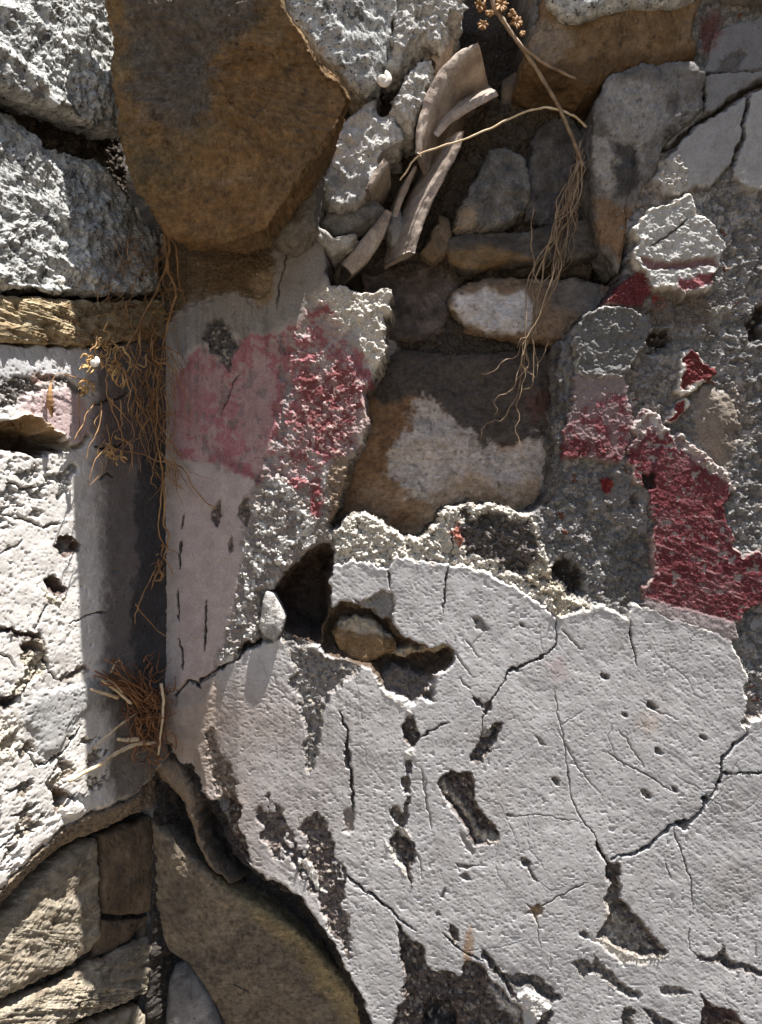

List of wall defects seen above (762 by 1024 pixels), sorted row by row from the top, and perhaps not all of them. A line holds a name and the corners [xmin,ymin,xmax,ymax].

crack [661,71,762,167]
spalling [203,319,239,369]
flaking render [561,306,762,624]
crack [8,604,58,703]
spalling [273,502,589,780]
crack [472,615,558,732]
spalling [205,728,353,961]
crack [340,710,356,814]
crack [345,871,417,932]
spalling [437,722,504,848]
spalling [580,856,669,960]
crack [506,689,762,953]